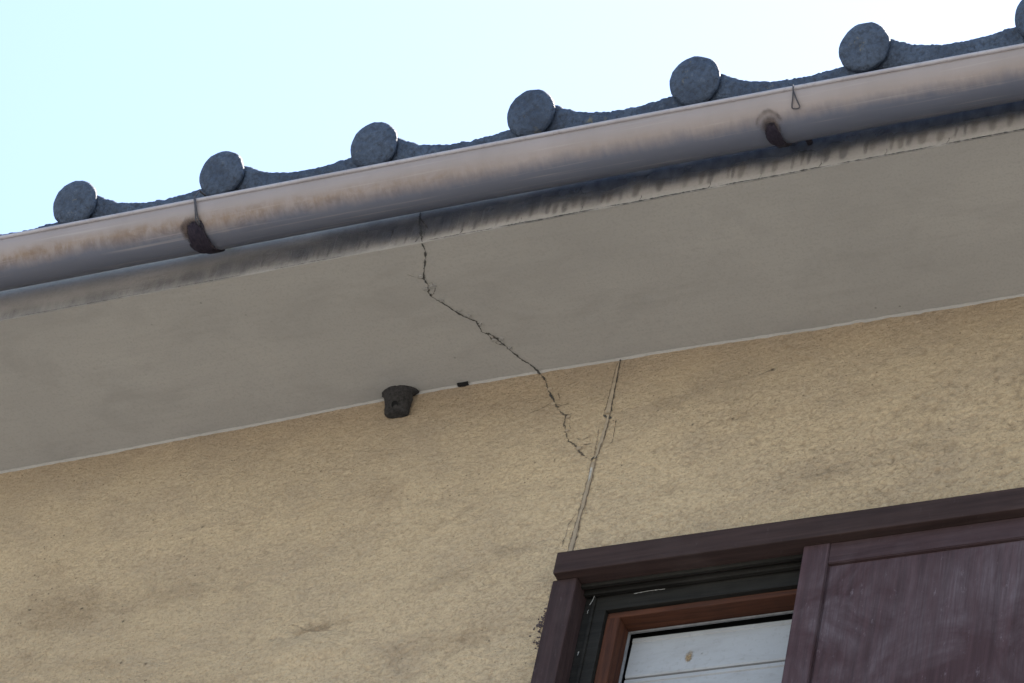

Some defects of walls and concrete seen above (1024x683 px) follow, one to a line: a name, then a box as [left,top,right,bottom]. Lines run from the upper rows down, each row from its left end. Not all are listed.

water stain [288,100,1024,258]
crack [412,129,1024,551]